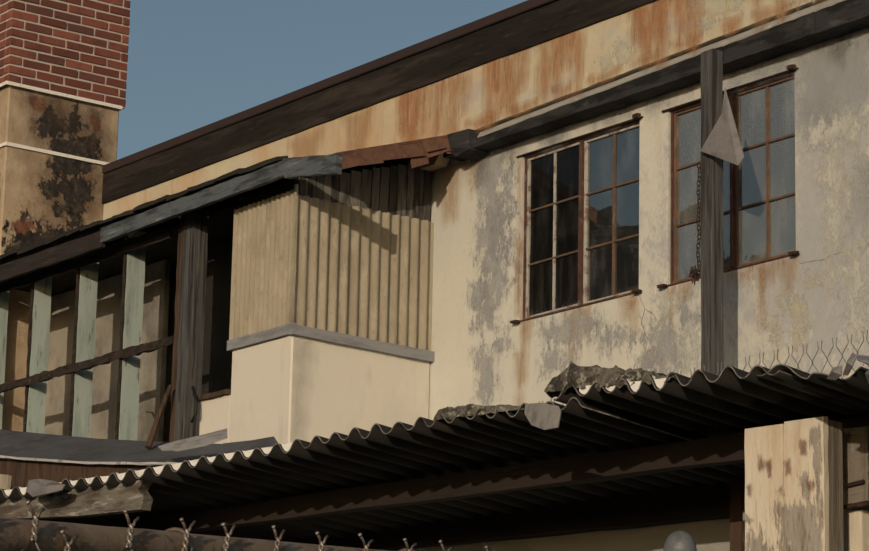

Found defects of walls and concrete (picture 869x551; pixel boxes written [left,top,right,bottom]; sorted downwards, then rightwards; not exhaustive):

peeling [807,103,869,173]
damp [1,171,83,253]